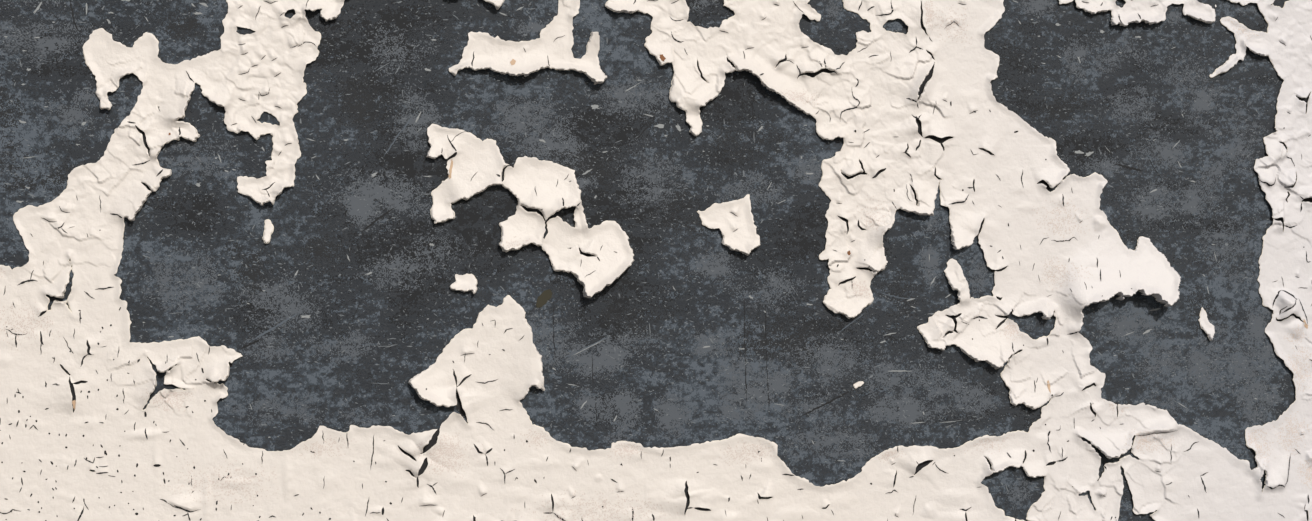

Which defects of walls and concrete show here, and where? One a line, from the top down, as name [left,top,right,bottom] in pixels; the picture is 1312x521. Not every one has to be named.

peeling [0,0,276,269]
crack [127,107,181,193]
peeling [1302,184,1312,198]
peeling [40,258,74,315]
peeling [111,0,1051,487]
peeling [981,0,1296,521]
crack [0,195,185,521]
crack [322,320,583,521]
crack [984,378,1122,469]
crack [160,449,232,520]
crack [546,449,834,521]